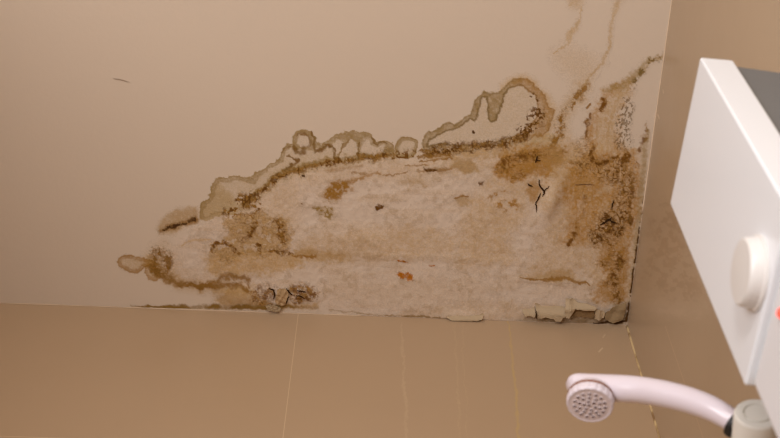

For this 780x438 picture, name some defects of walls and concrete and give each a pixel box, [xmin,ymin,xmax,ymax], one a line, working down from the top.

crack [528,157,549,212]
leakage [115,0,712,438]
peeling [522,303,566,322]